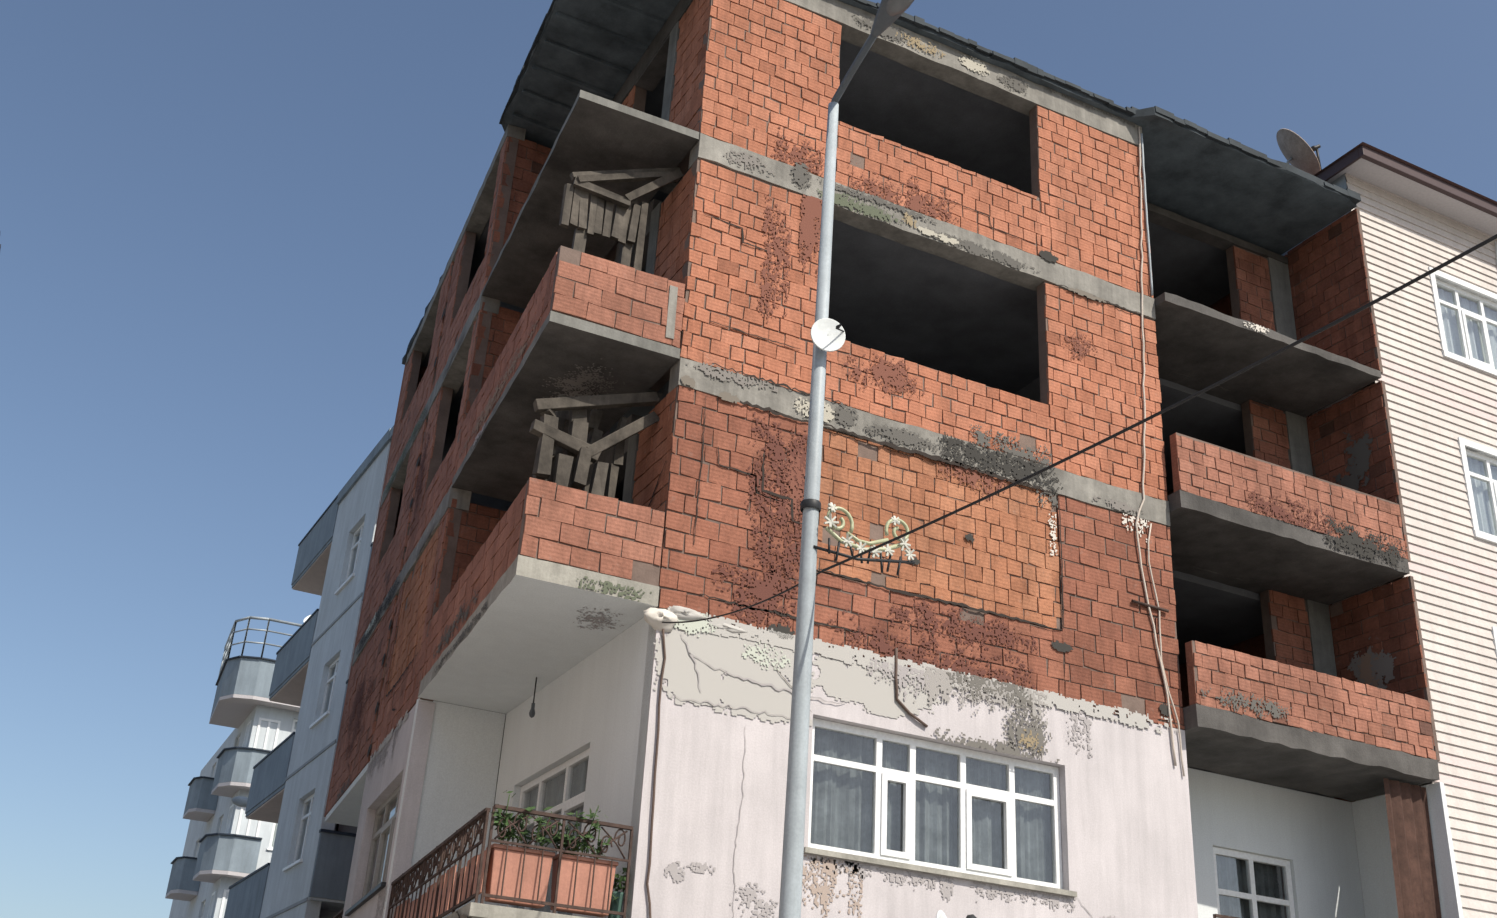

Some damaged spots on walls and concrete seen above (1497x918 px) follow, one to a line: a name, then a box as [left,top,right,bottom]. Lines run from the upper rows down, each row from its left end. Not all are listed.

water stain [723,126,1041,323]
water stain [687,362,778,392]
water stain [843,352,926,400]
water stain [712,397,1063,628]
water stain [1245,479,1407,569]
peeling [653,606,795,724]
water stain [828,598,1093,764]
peeling [811,638,1178,733]
flaking render [1347,637,1396,690]
crack [673,634,847,918]